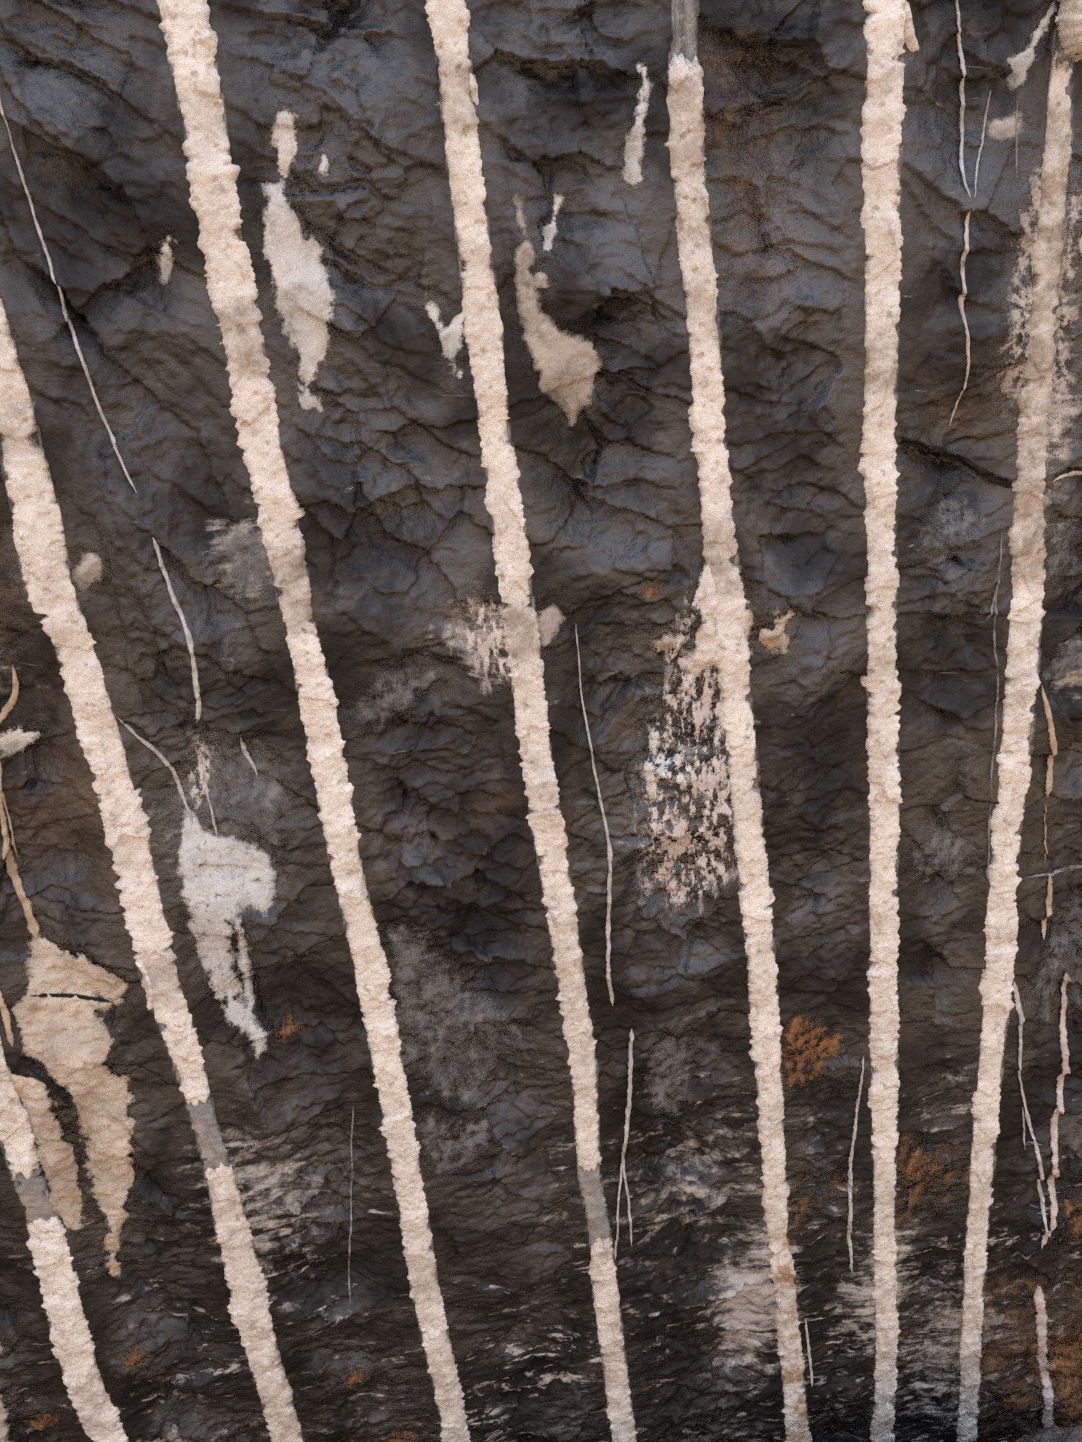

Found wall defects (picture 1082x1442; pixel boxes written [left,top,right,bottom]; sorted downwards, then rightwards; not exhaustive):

leakage [1007,3,1057,90]
leakage [262,110,335,412]
leakage [425,302,465,378]
leakage [513,195,602,426]
leakage [998,168,1042,399]
leakage [1047,195,1082,461]
leakage [0,727,40,756]
leakage [635,594,736,912]
leakage [177,742,276,1058]
corrosion [781,1016,841,1088]
corrosion [1064,1197,1082,1238]
corrosion [977,1281,1082,1441]